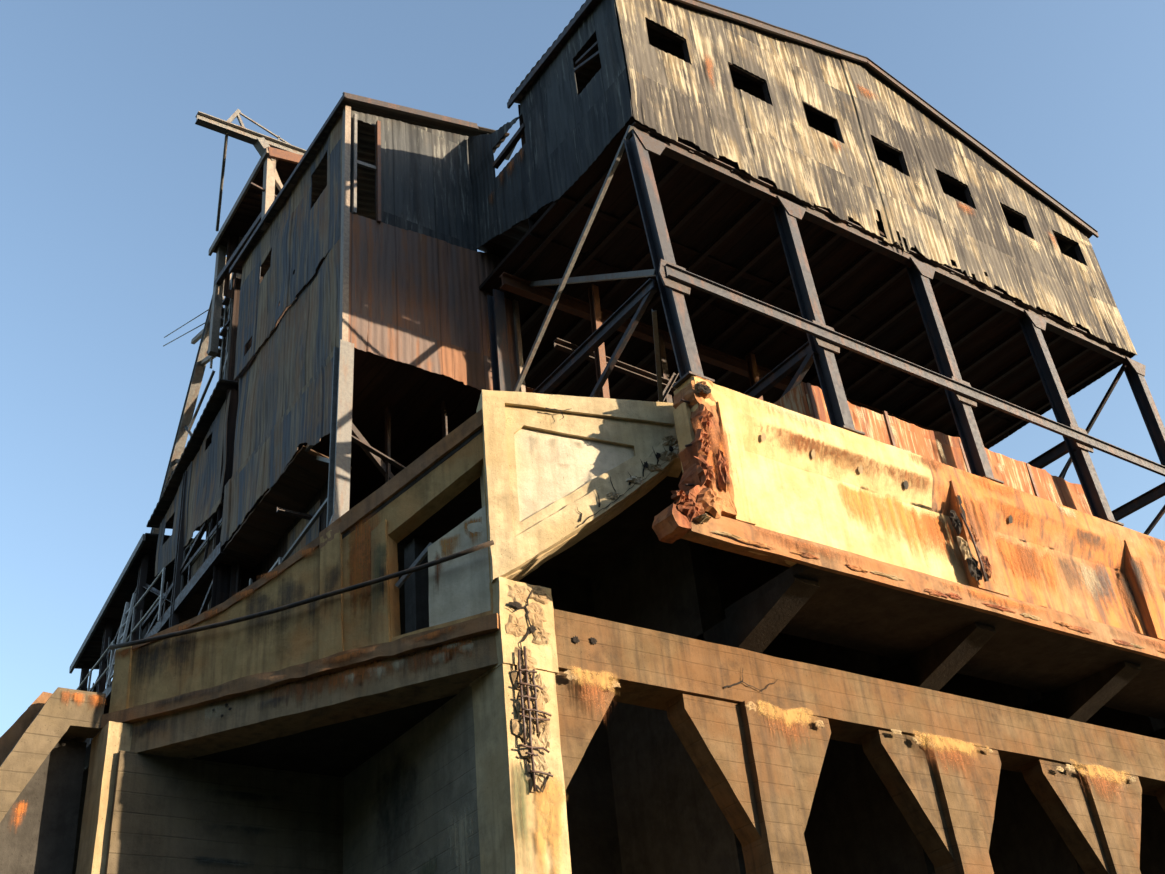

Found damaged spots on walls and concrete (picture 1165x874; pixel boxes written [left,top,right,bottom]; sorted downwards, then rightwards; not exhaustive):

crack [577,446,668,528]
spalling [671,381,775,549]
corrosion [890,454,938,491]
corrosion [778,534,850,562]
corrosion [957,477,1057,587]
corrosion [953,584,1037,610]
spalling [982,602,1092,635]
spalling [505,584,554,793]
peeling [564,667,621,708]
peeling [745,701,824,742]
peeling [891,729,993,771]
peeling [1056,761,1136,799]